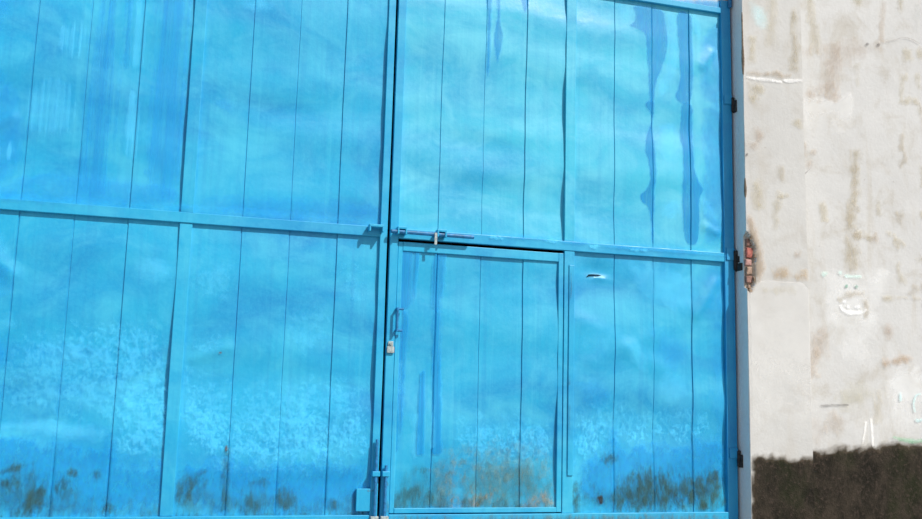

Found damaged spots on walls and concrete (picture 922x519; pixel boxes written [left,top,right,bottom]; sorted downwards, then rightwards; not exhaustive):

flaking render [744,219,763,293]
damp [752,443,922,519]